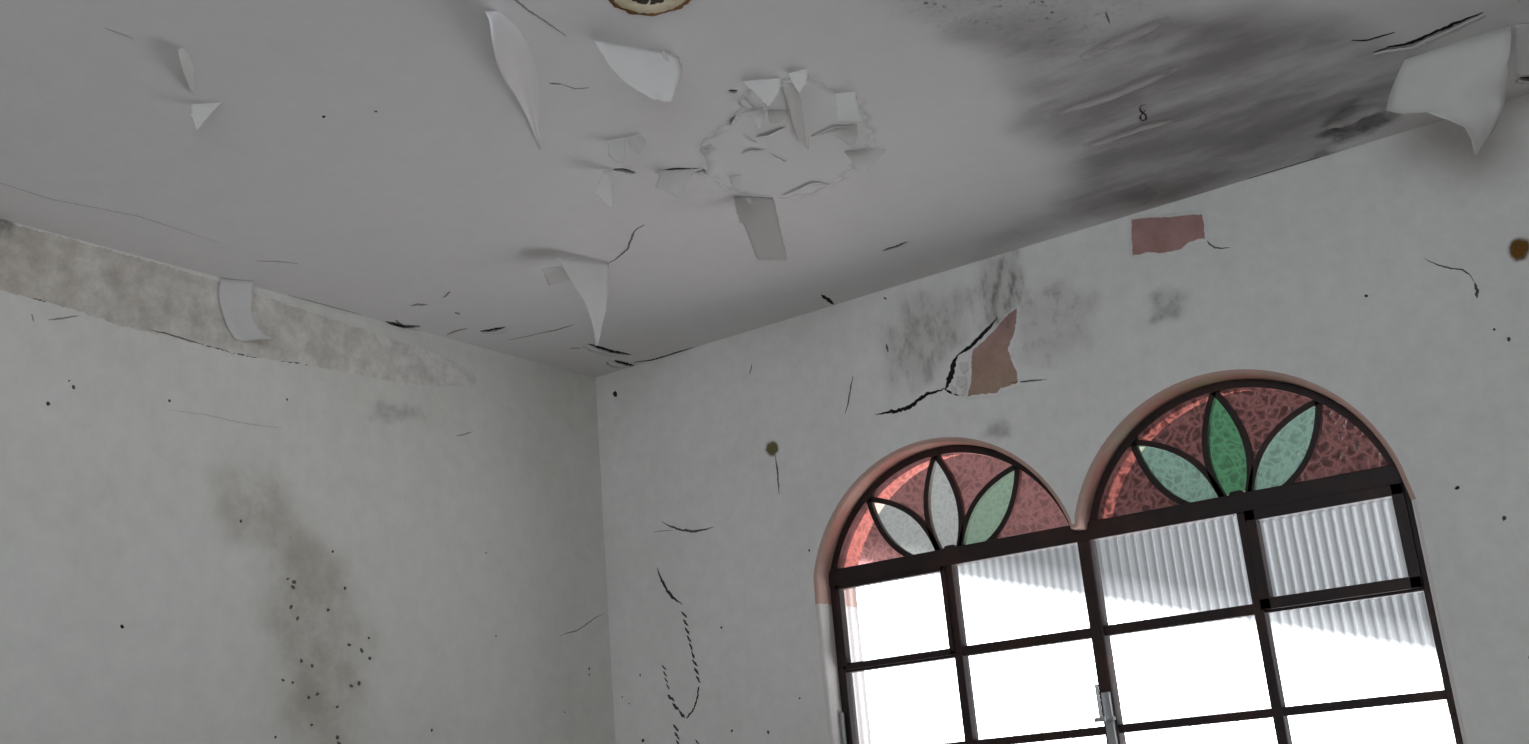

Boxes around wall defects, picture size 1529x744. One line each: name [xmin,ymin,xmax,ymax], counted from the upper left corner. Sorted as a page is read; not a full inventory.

peeling [178,48,223,130]
peeling [484,10,542,150]
peeling [594,41,683,102]
crack [1352,12,1485,56]
peeling [655,69,886,261]
spalling [1128,211,1209,259]
corrosion [1510,239,1529,260]
flaking render [0,220,482,390]
peeling [542,258,610,346]
crack [876,317,998,415]
spalling [951,305,1021,400]